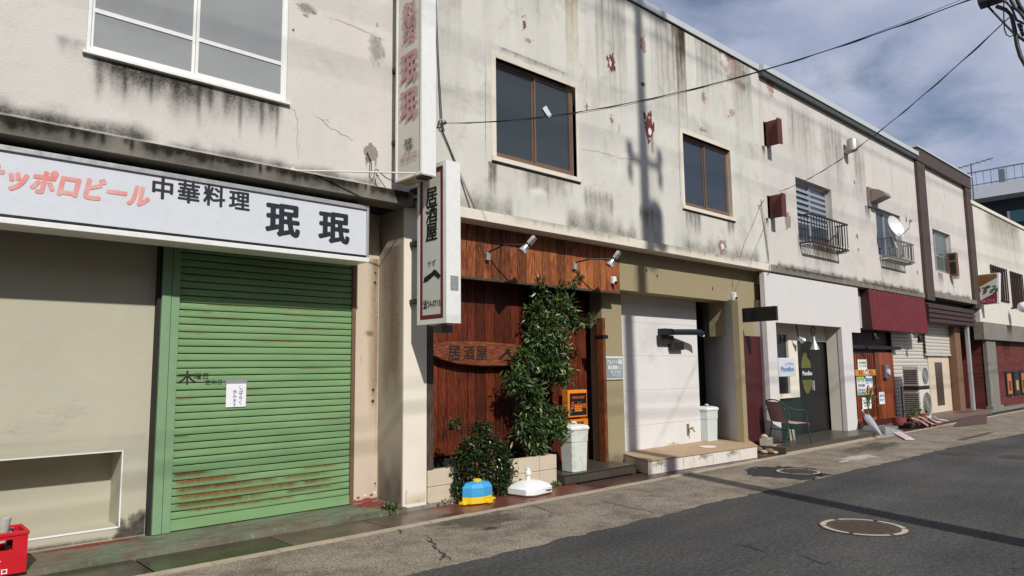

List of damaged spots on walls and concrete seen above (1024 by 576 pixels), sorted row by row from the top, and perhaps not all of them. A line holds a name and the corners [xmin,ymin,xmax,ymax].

water stain [102,61,212,99]
water stain [225,91,276,111]
peeling [643,111,654,144]
corrosion [175,464,334,510]